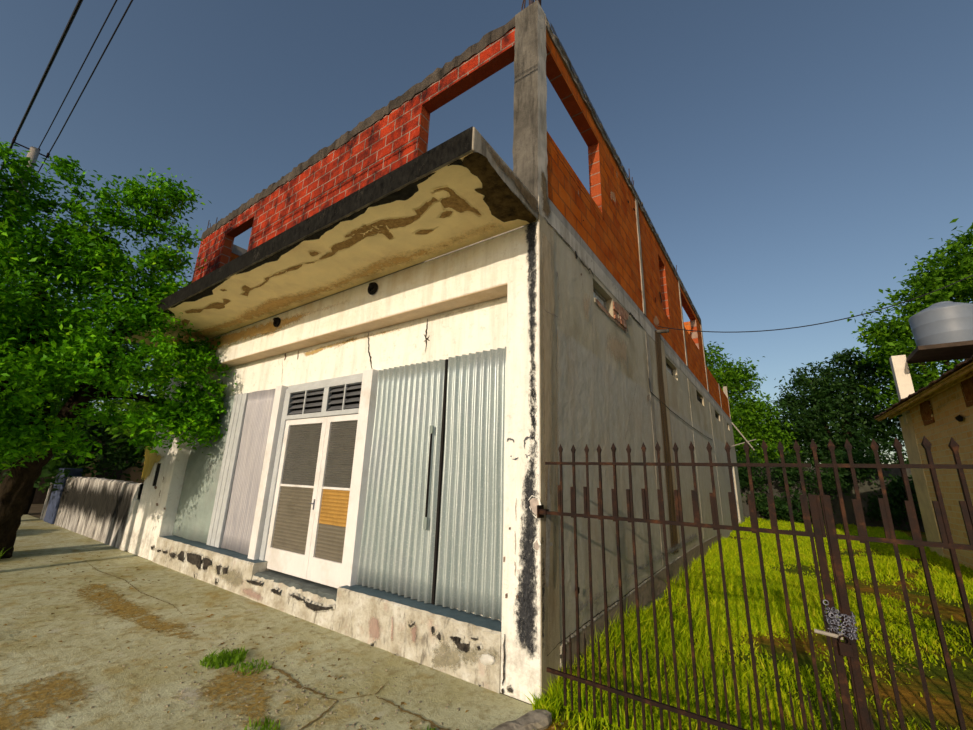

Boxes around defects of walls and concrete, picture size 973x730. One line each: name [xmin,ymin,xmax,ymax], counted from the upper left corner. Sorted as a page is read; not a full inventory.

peeling [181,185,484,326]
flaking render [594,297,629,332]
water stain [124,126,559,660]
flaking render [151,545,228,585]
flaking render [245,579,335,613]
flaking render [431,626,483,653]